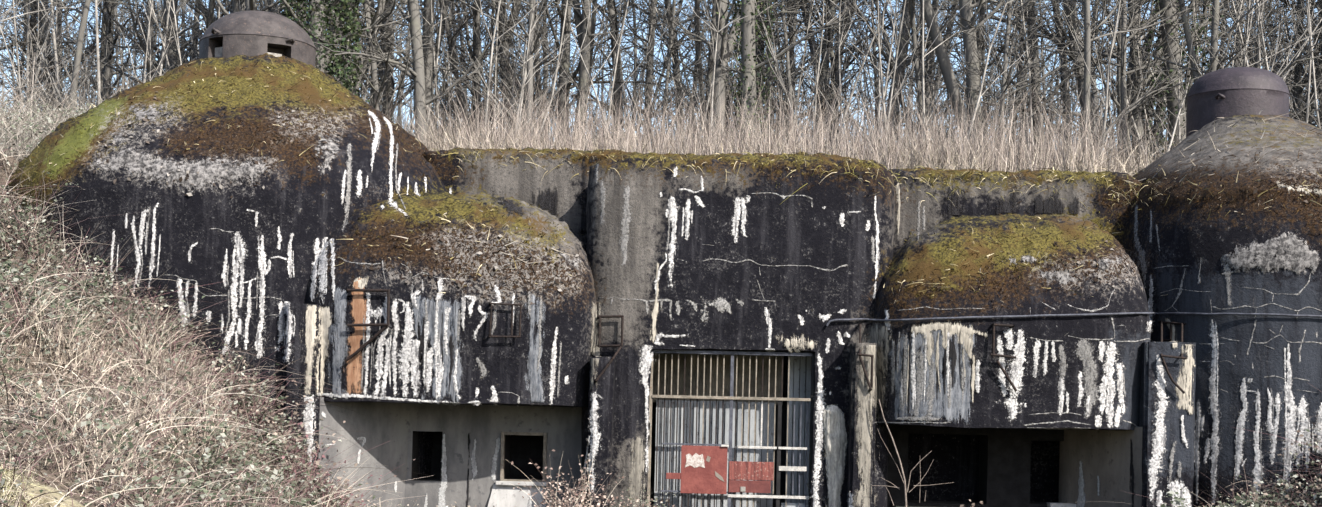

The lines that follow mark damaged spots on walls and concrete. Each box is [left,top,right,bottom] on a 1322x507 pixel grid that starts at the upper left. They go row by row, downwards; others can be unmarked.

water stain [110,203,161,294]
corrosion [343,277,369,394]
water stain [177,110,570,469]
water stain [584,303,602,492]
water stain [731,195,751,243]
water stain [764,307,775,352]
water stain [797,195,1126,507]
water stain [988,191,1081,216]
water stain [1129,206,1322,507]